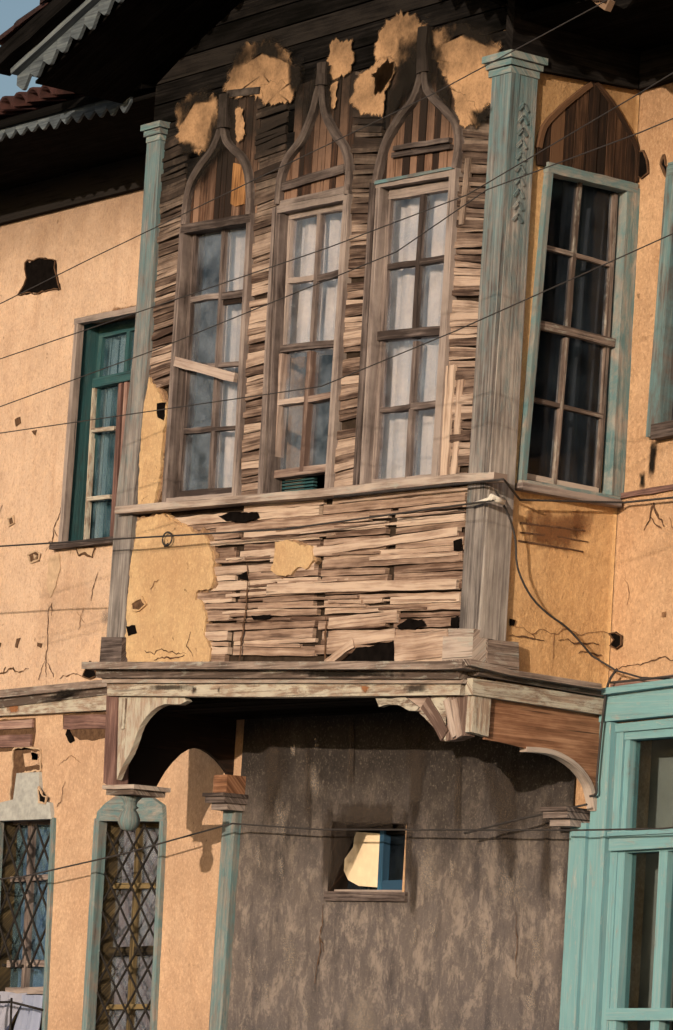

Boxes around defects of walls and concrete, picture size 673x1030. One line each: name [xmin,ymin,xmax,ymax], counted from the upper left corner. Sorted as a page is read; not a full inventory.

flaking render [149,135,190,388]
flaking render [166,56,490,662]
spalling [157,402,166,420]
spalling [130,596,147,612]
crack [509,623,673,669]
peeling [0,718,42,800]
spalling [37,786,48,804]